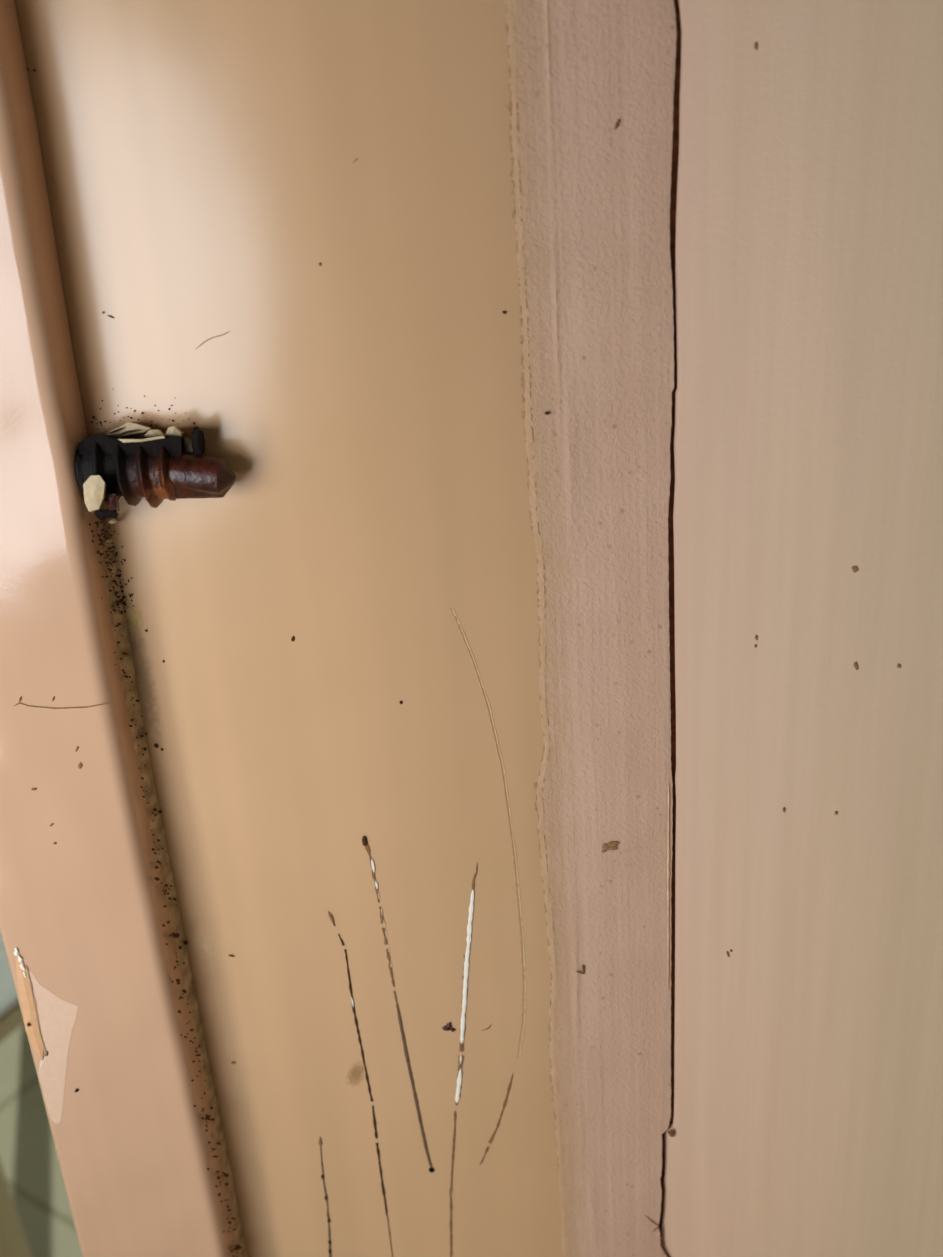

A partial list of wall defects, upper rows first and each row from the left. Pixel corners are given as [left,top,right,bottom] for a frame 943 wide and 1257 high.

peeling [14,947,78,1124]
crack [645,0,682,1242]